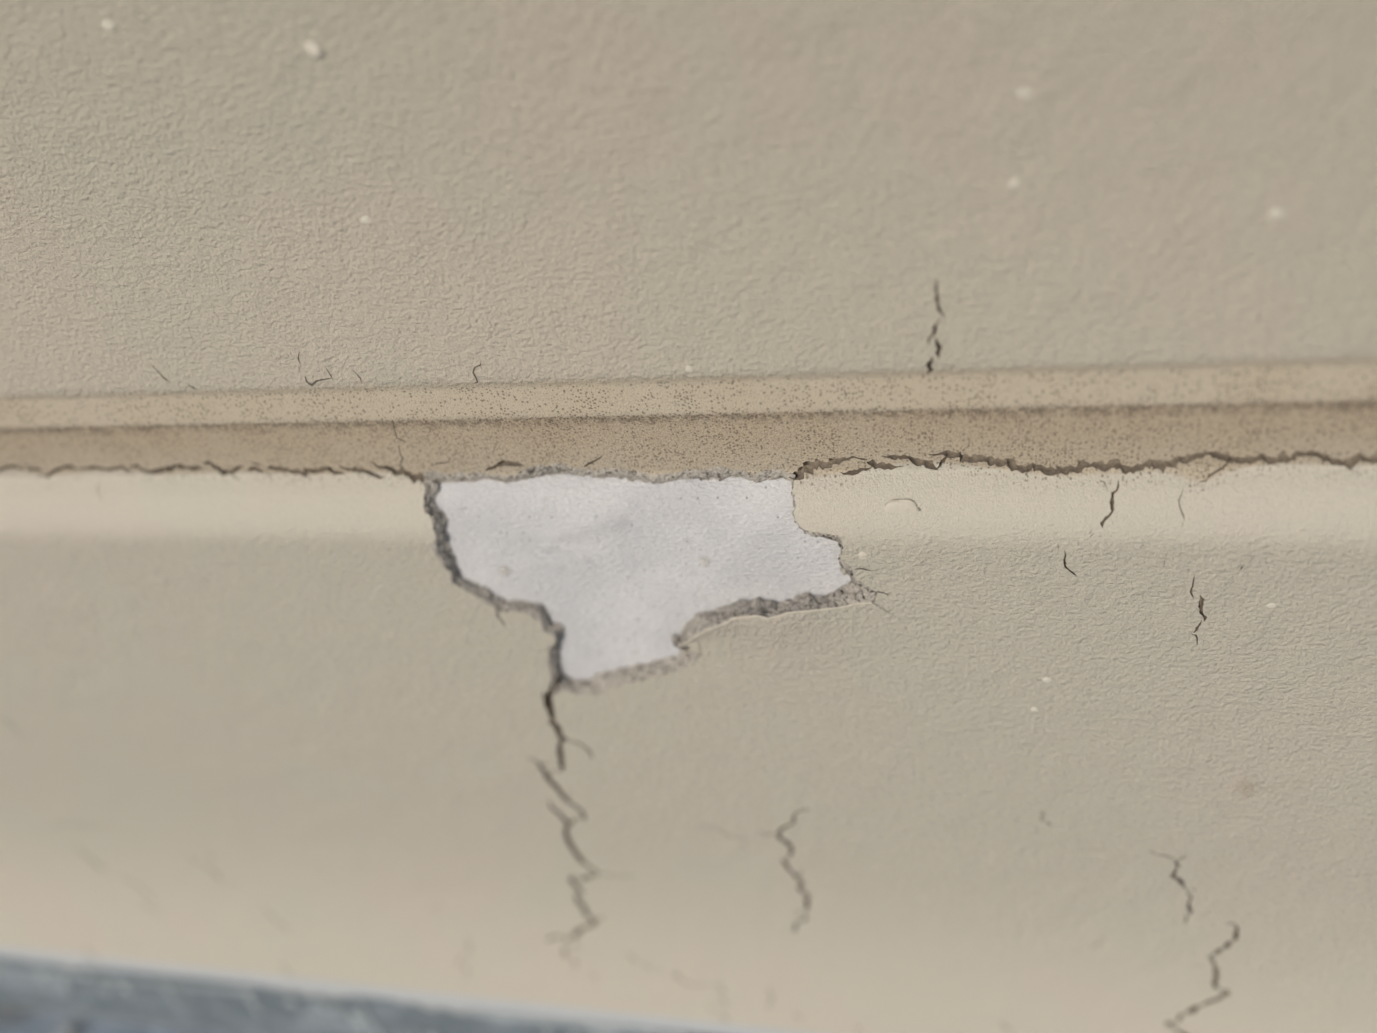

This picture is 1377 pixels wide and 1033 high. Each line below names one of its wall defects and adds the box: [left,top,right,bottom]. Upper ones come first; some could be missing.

crack [298,353,367,391]
crack [926,279,945,374]
crack [0,420,447,484]
crack [486,443,524,471]
crack [789,450,1377,577]
flaking render [423,463,908,722]
crack [1164,555,1207,644]
crack [528,678,635,980]
crack [760,809,812,933]
crack [1149,851,1195,923]
crack [1165,922,1239,1033]